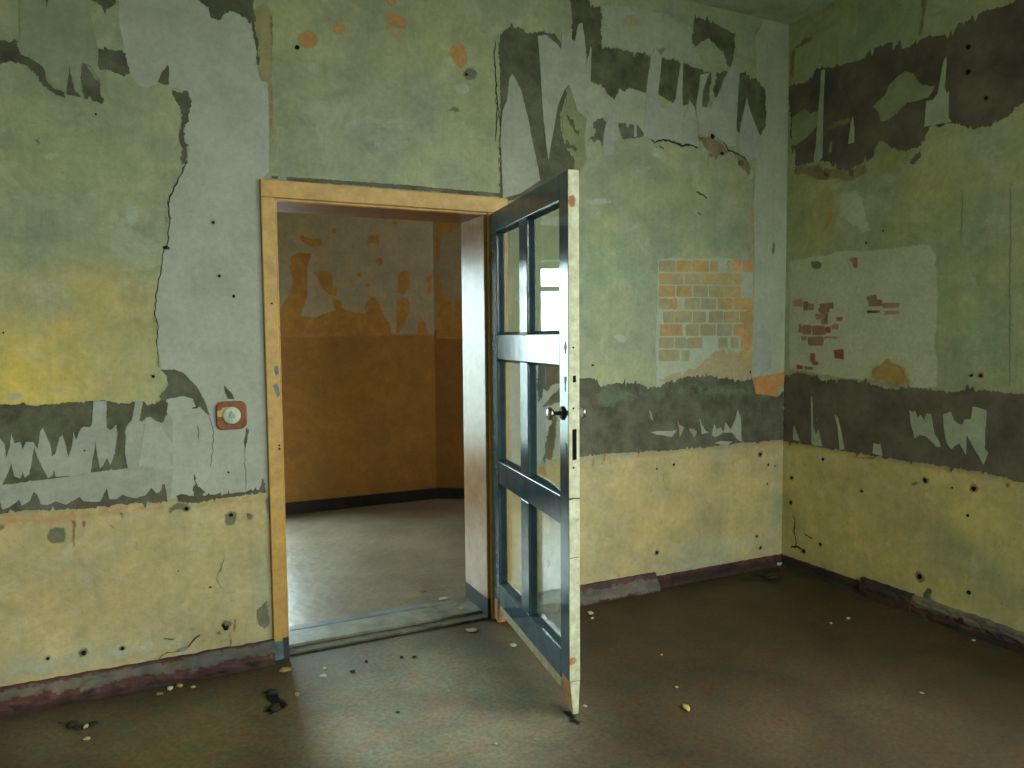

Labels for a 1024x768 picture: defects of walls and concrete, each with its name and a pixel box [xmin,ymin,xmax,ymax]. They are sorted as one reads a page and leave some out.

peeling [0,0,280,522]
crack [153,163,186,365]
crack [651,139,709,161]
peeling [498,0,1024,482]